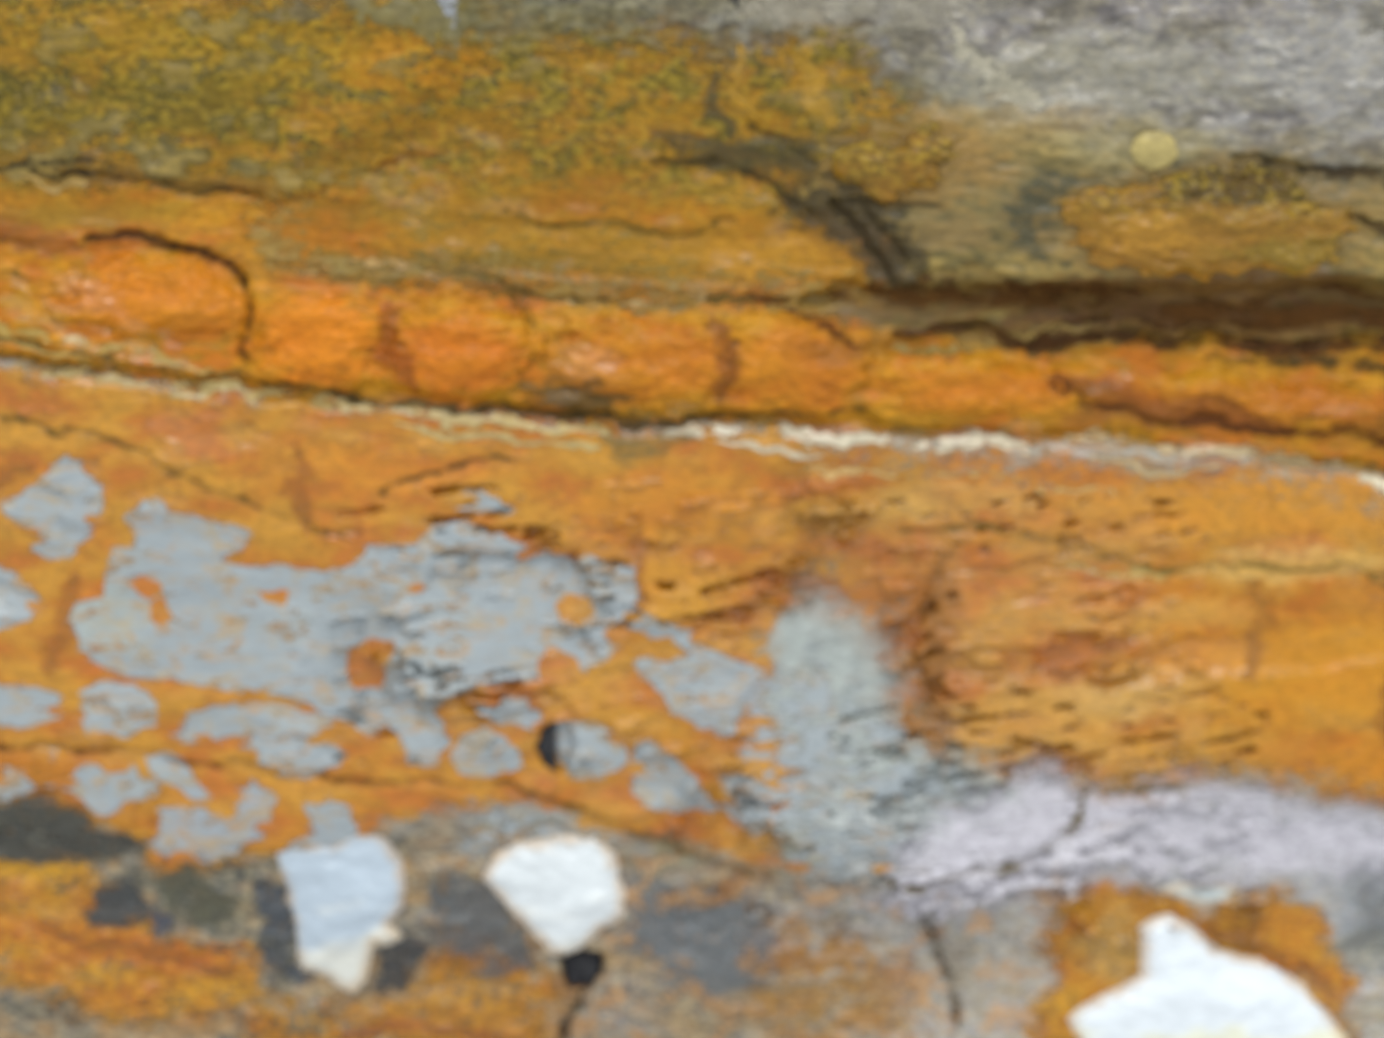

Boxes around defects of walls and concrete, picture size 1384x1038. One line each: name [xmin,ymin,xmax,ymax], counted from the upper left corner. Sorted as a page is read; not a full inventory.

water stain [731,0,1046,108]
water stain [19,173,89,194]
corrosion [0,0,914,415]
water stain [655,72,929,290]
crack [1262,159,1381,178]
crack [0,230,866,432]
crack [420,199,1384,447]
corrosion [0,174,1384,872]
peeling [0,455,982,884]
corrosion [0,857,293,1028]
spalling [560,949,603,987]
corrosion [1023,877,1360,1038]